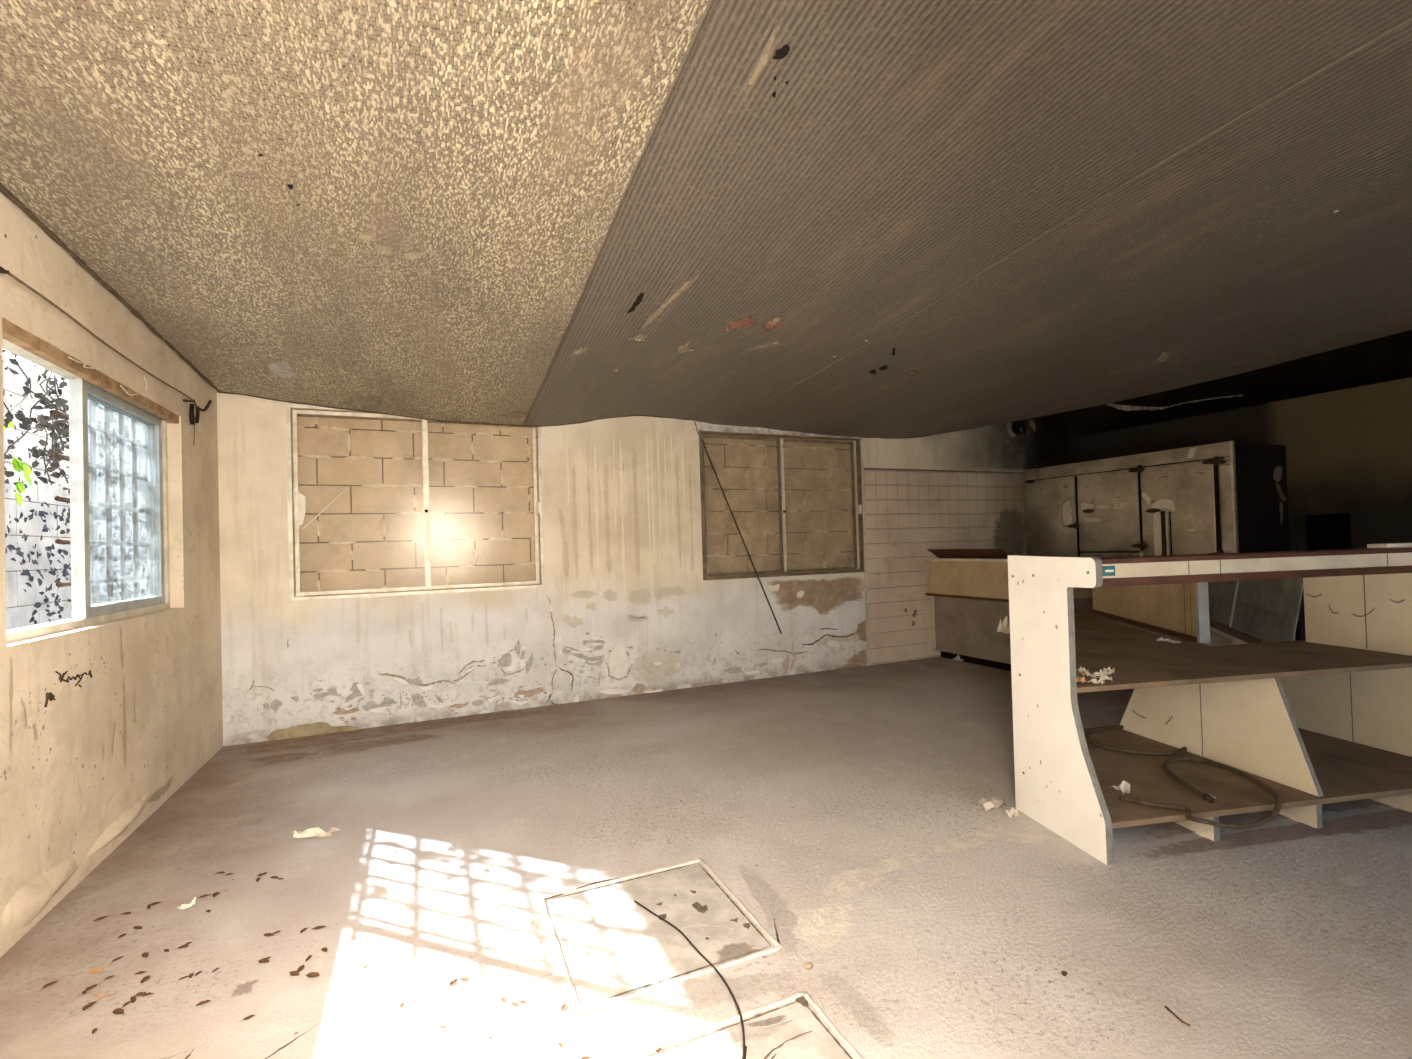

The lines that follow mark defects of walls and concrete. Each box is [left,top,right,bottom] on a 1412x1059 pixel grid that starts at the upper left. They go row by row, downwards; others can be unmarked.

peeling [257,640,551,723]
flaking render [562,632,683,702]
peeling [691,656,803,688]
crack [264,1024,318,1059]